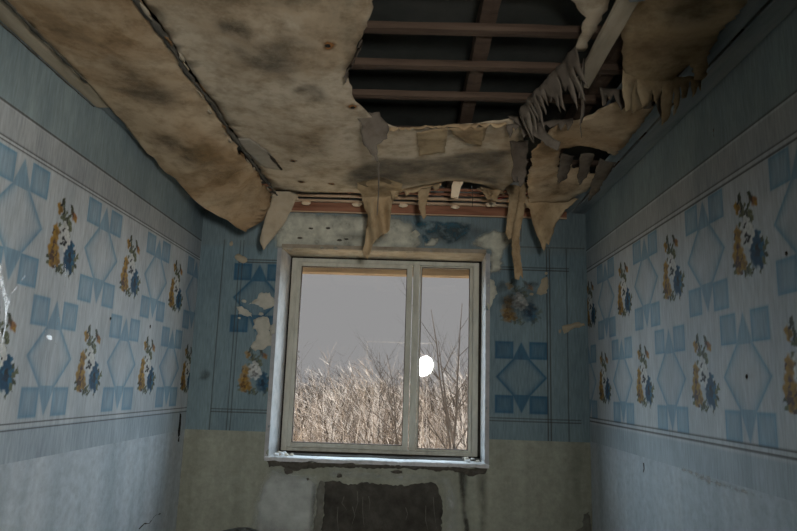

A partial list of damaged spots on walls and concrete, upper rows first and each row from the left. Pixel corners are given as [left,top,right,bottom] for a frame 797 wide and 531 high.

crack [132,0,317,196]
spalling [267,460,487,531]